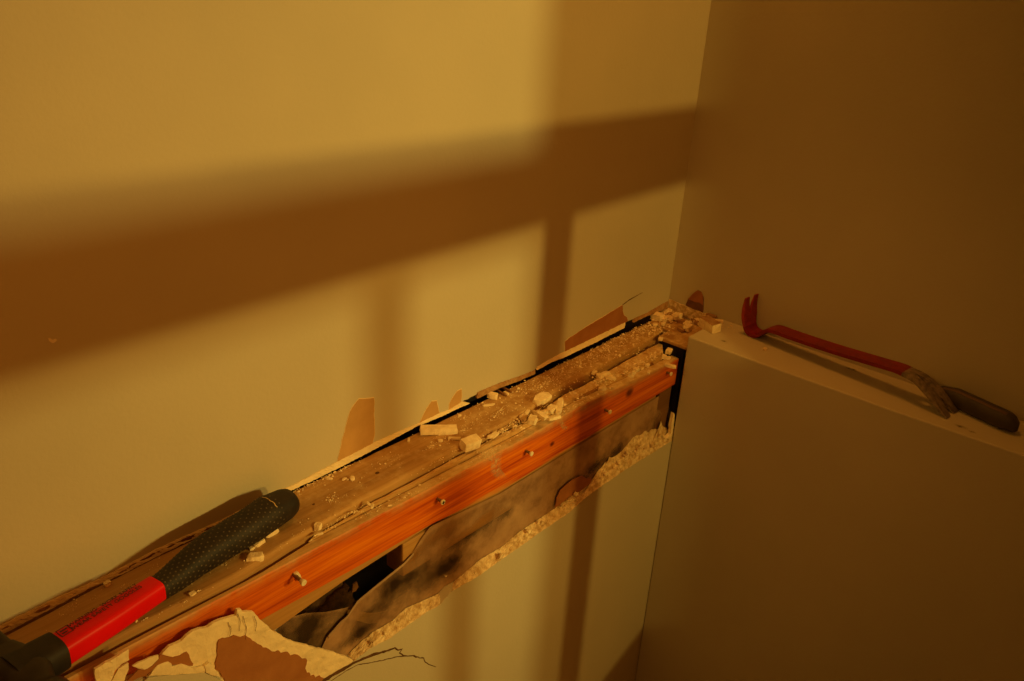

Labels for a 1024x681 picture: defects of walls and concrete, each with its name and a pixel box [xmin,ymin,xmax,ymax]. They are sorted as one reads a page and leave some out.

spalling [282,299,717,490]
spalling [0,508,243,636]
crack [322,647,436,681]
spalling [93,412,675,681]